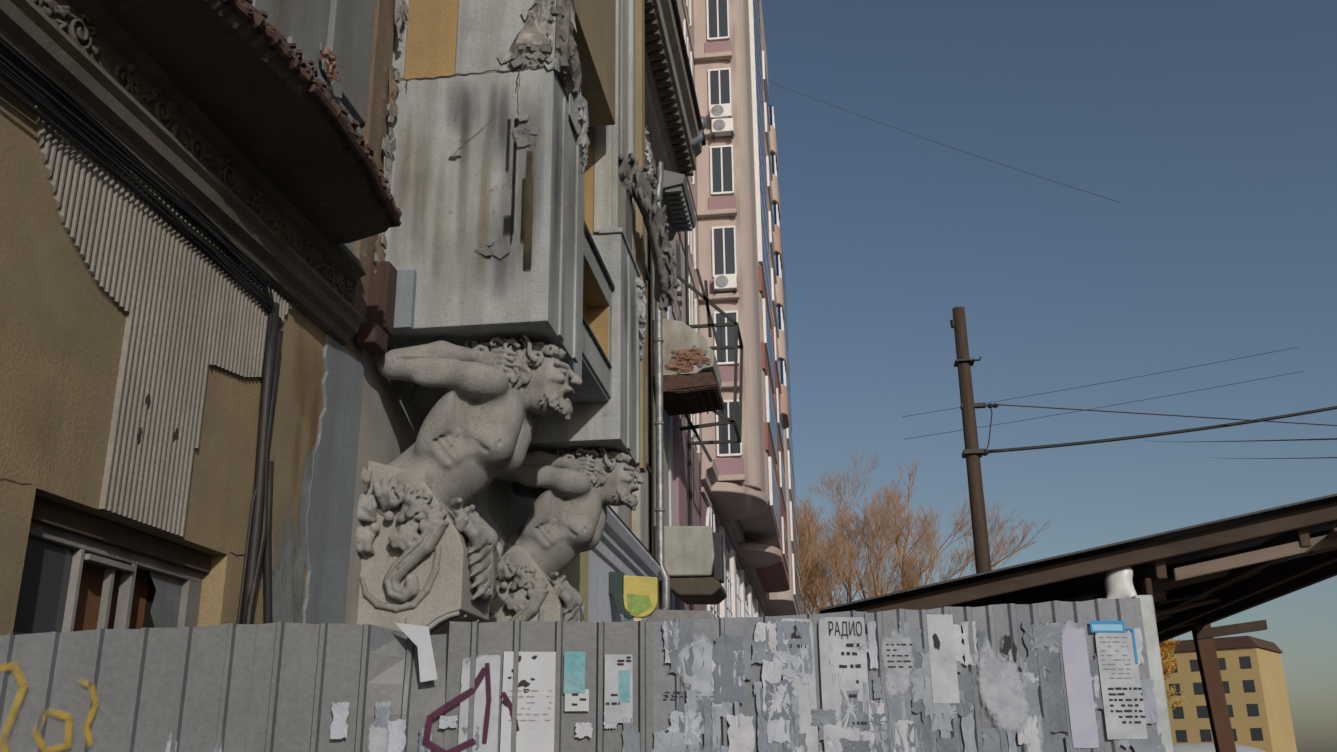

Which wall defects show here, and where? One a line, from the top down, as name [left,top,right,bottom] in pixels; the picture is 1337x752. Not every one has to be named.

peeling [395,0,409,42]
spalling [320,42,342,99]
crack [400,66,546,155]
spalling [497,0,589,134]
peeling [374,233,388,274]
peeling [272,456,313,623]